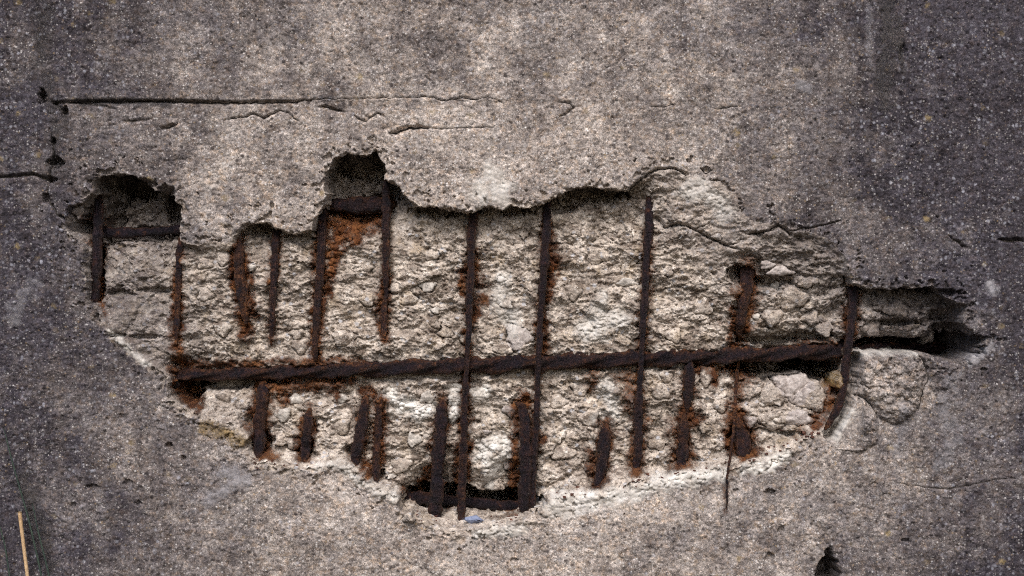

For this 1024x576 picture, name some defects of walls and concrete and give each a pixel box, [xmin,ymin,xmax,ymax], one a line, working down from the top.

crack [0,96,500,218]
crack [628,167,684,192]
crack [658,220,838,248]
rust [90,179,948,521]
spalling [64,151,985,533]